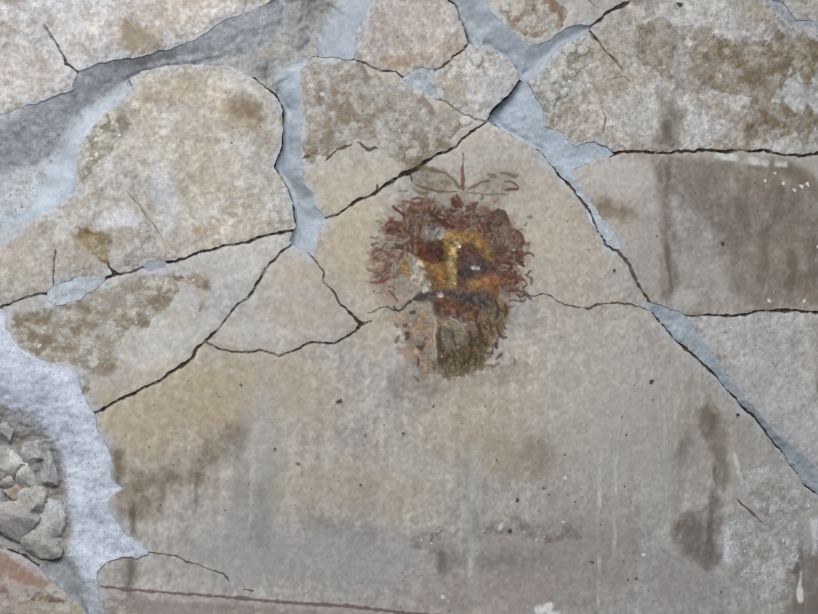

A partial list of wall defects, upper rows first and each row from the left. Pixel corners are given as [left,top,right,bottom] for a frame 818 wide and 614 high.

crack [44,24,79,74]
crack [434,37,468,71]
crack [588,0,631,81]
crack [325,82,518,219]
crack [609,148,818,158]
water stain [714,153,818,200]
crack [94,78,434,413]
crack [0,249,57,309]
crack [530,169,790,466]
crack [683,308,818,317]
water stain [722,525,739,565]
peeling [1,583,71,614]